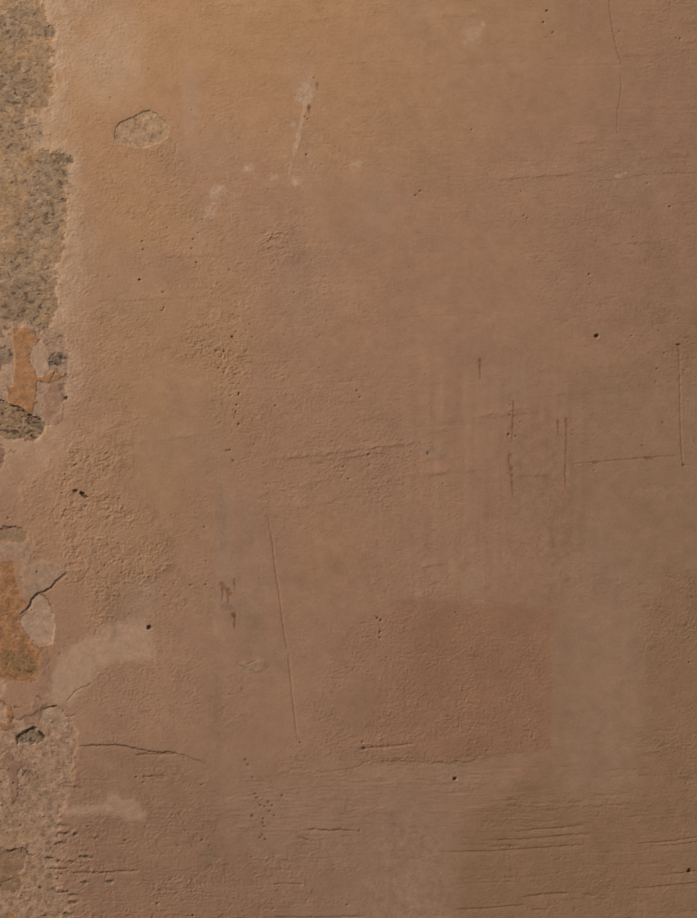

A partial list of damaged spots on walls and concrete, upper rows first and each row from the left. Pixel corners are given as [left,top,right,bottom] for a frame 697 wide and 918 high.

spalling [0,0,76,470]
crack [19,572,68,616]
spalling [0,561,140,918]
crack [79,744,206,765]